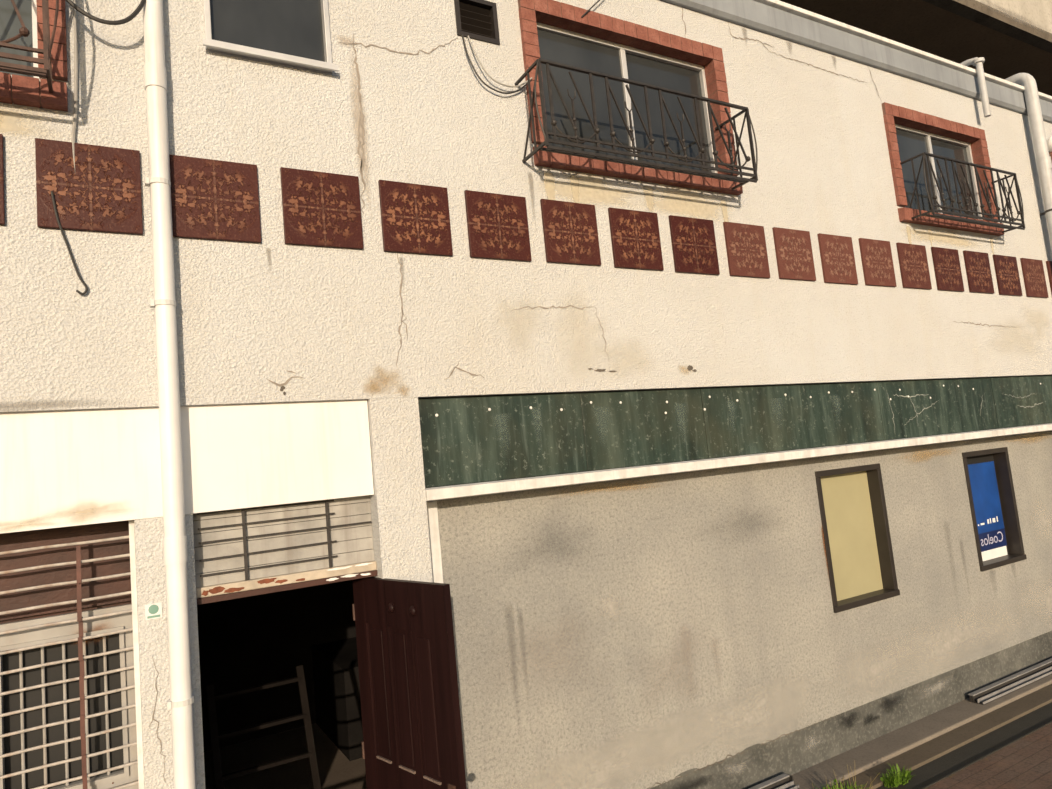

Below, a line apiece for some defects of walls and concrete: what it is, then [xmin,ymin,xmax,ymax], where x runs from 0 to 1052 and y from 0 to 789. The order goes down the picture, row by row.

crack [338,34,457,213]
crack [396,252,408,368]
corrosion [201,586,245,596]